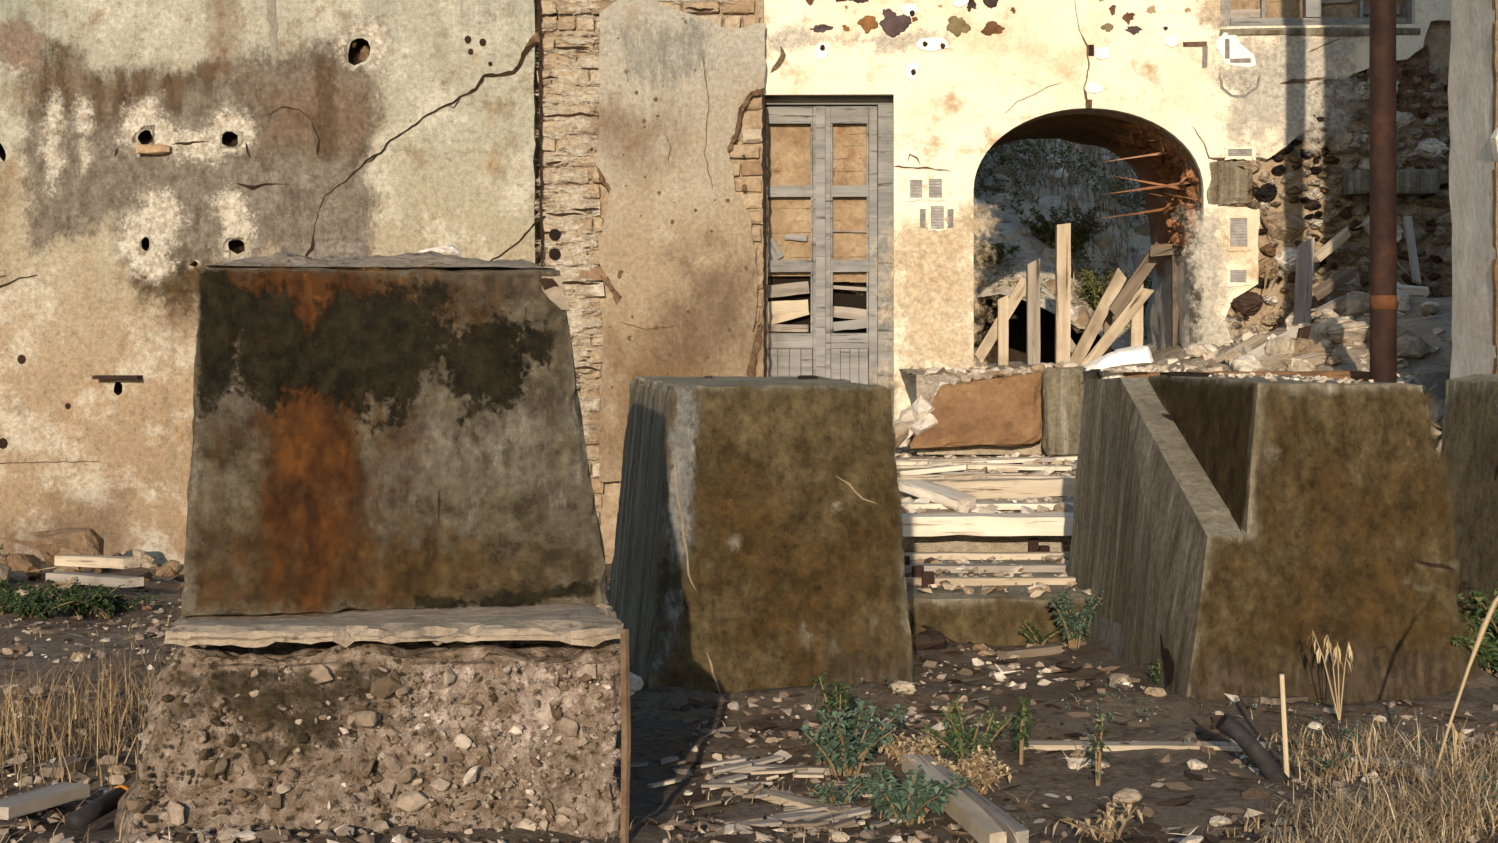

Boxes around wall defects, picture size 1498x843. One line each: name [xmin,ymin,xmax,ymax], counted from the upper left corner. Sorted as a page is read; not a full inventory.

flaking render [810,0,918,38]
flaking render [938,0,1016,37]
flaking render [1099,0,1168,35]
crack [237,106,320,190]
crack [305,0,546,267]
spalling [596,166,627,190]
spalling [727,89,763,157]
flaking render [1211,68,1370,344]
flaking render [1396,45,1452,298]
leakage [0,17,582,604]
corrosion [225,266,457,339]
spalling [600,270,624,305]